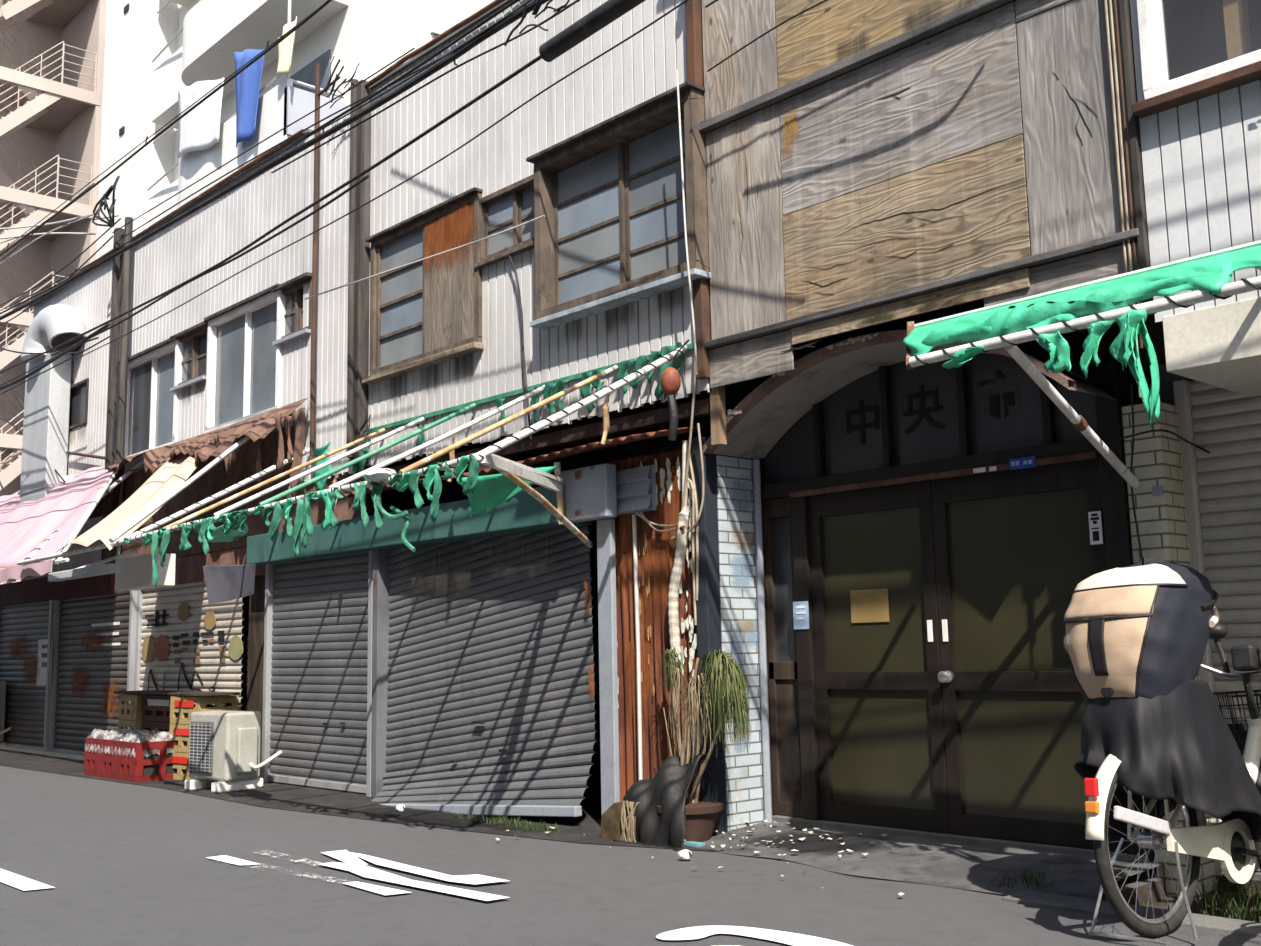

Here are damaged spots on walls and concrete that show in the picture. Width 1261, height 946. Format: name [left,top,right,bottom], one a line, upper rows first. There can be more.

crack [1053,72,1098,146]
rust [618,466,681,614]
rust [627,641,649,715]